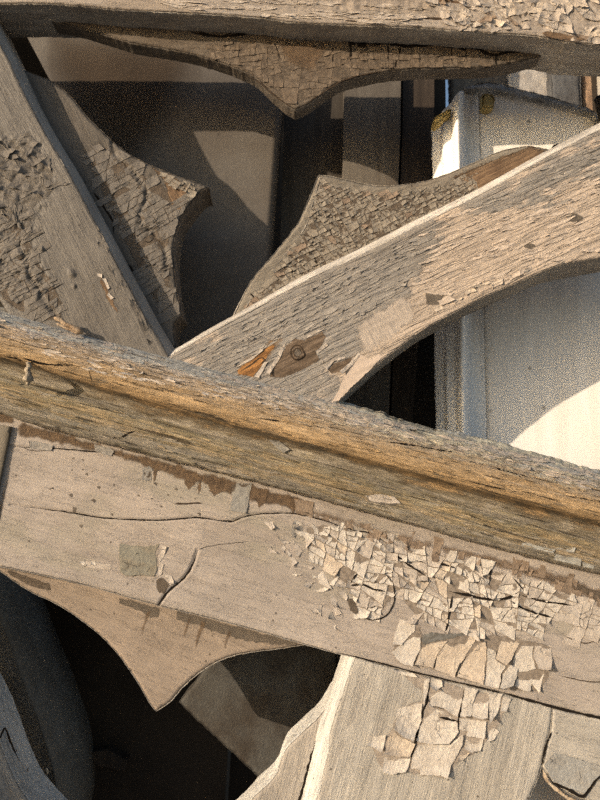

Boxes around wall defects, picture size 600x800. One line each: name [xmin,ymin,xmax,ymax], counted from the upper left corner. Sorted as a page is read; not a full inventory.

peeling [205,34,510,104]
spalling [463,82,599,125]
peeling [0,133,600,442]
peeling [436,434,600,490]
crack [14,502,600,641]
peeling [263,499,358,630]
peeling [521,543,595,569]
peeling [553,596,600,648]
peeling [367,619,552,779]
crack [298,744,315,800]
peeling [544,753,600,793]